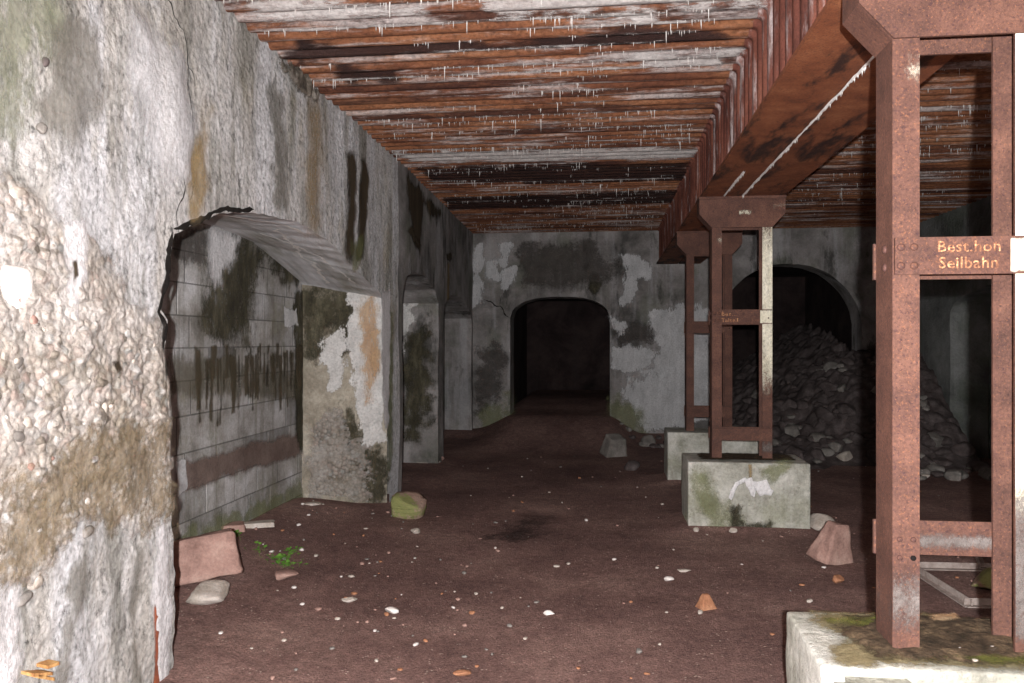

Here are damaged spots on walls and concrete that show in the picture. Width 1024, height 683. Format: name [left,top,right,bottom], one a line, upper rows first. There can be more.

damp [247,0,763,288]
damp [724,56,875,197]
flaking render [471,241,518,309]
damp [170,291,303,489]
flaking render [297,283,419,529]
damp [472,340,508,414]
damp [729,477,774,528]